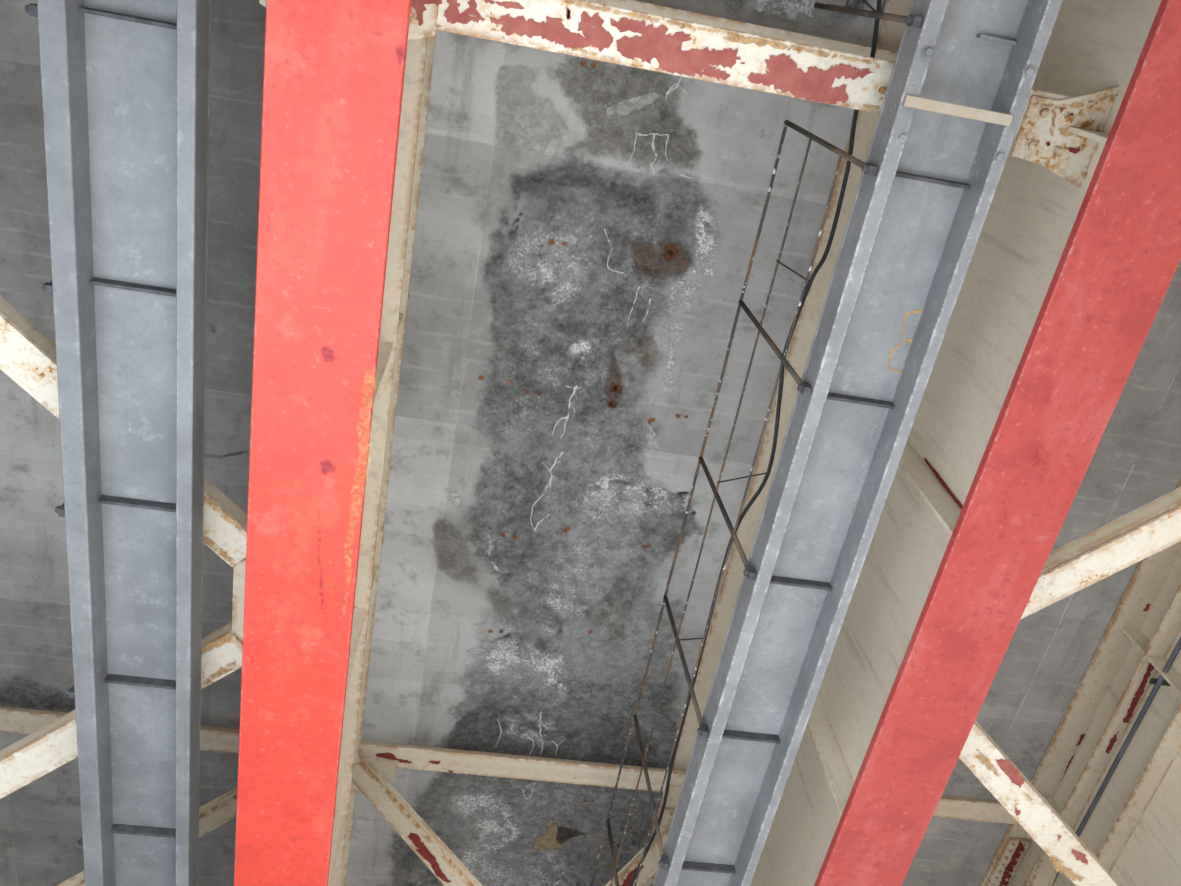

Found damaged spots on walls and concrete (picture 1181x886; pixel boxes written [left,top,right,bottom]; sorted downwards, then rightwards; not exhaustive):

peeling [411,0,873,105]
rust [1026,96,1113,143]
crack [625,133,692,178]
crack [604,229,651,322]
rust [632,243,690,280]
rust [605,353,623,409]
leakage [434,58,717,769]
crack [530,385,581,530]
peeling [995,759,1025,788]
leakage [415,772,663,886]
leakage [391,835,444,886]
peeling [407,833,451,883]